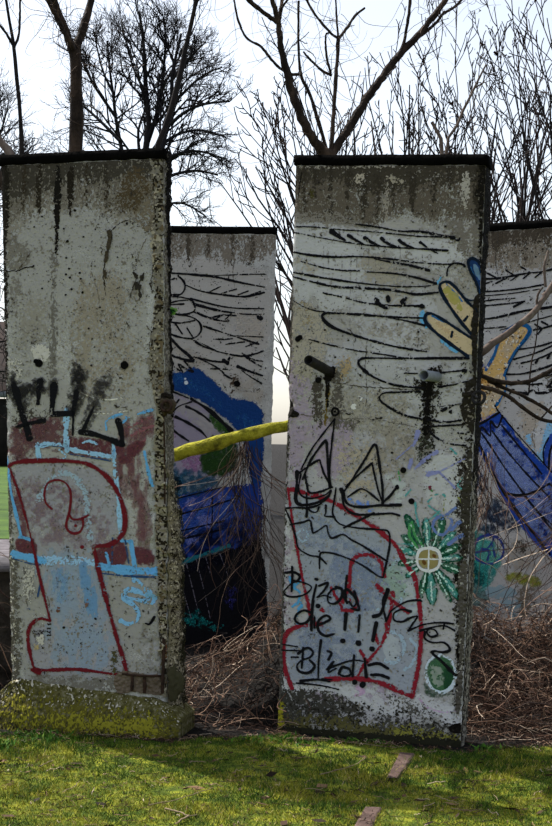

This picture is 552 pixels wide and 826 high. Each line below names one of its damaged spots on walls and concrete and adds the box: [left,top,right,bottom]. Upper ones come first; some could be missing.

water stain [0,453,180,732]
spalling [5,159,268,705]
water stain [1,143,276,443]
water stain [174,480,188,703]
peeling [278,165,552,742]